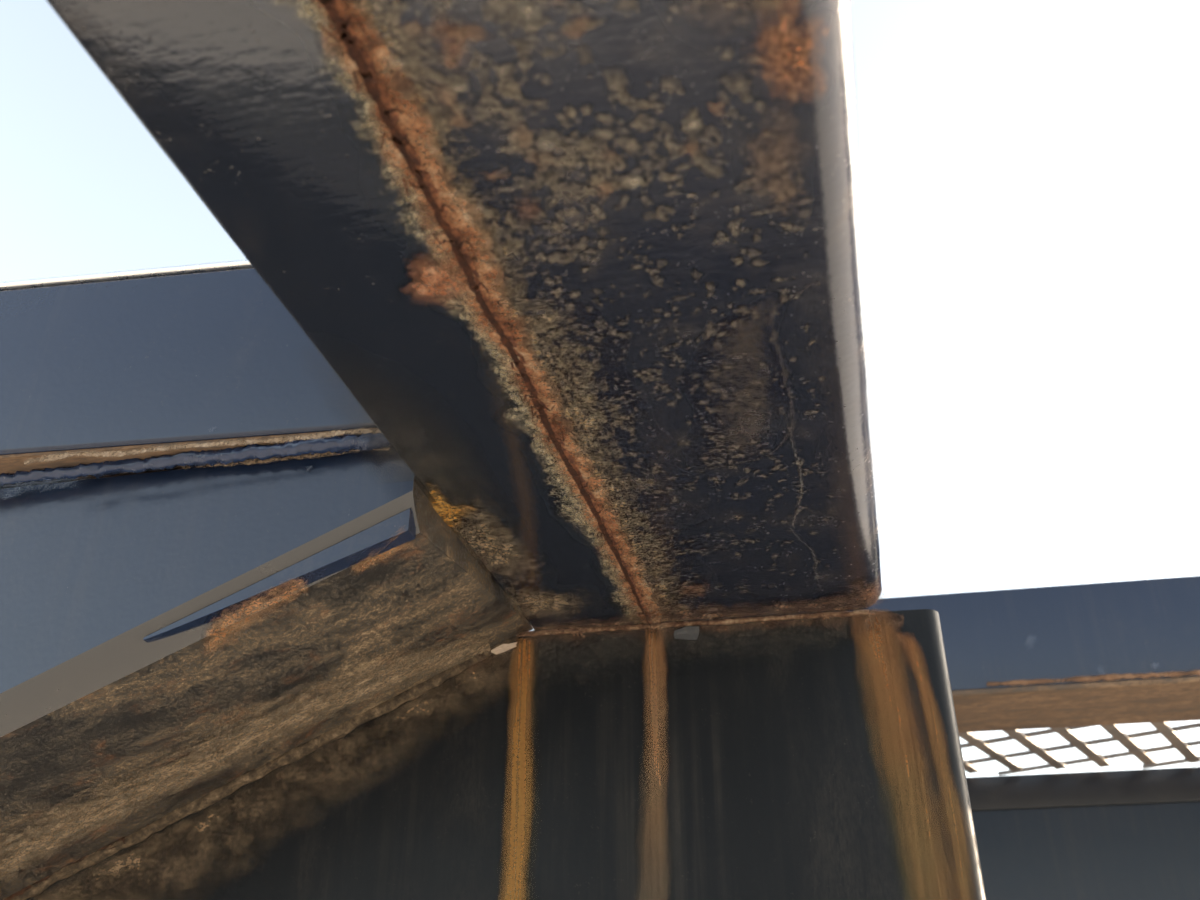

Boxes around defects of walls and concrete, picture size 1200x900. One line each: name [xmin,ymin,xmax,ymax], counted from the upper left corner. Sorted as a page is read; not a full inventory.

corrosion [408,259,465,299]
peeling [24,428,382,467]
corrosion [429,490,472,527]
corrosion [355,539,403,572]
corrosion [209,580,306,649]
corrosion [987,670,1200,686]
corrosion [469,584,969,900]